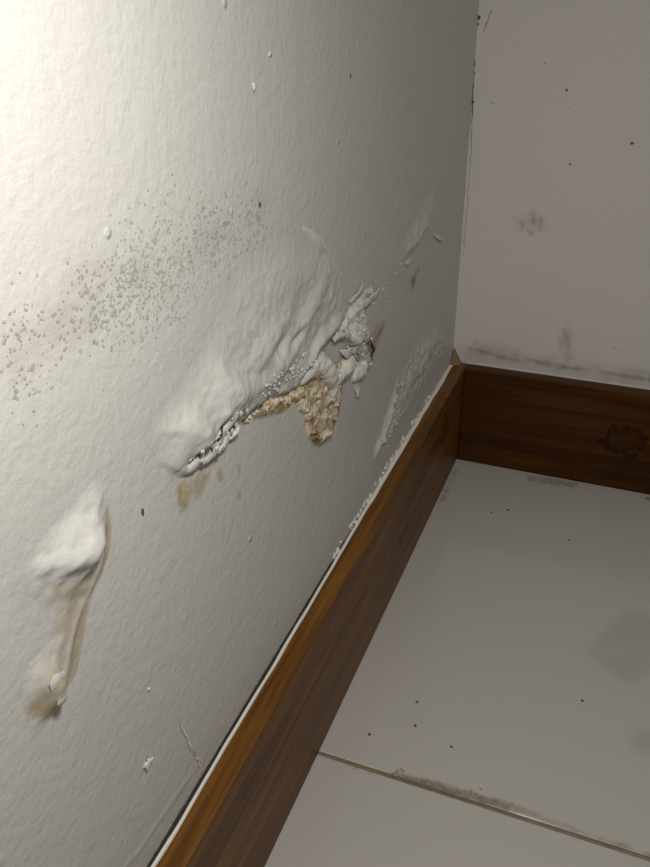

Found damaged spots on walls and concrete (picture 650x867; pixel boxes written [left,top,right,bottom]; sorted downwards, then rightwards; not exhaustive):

water stain [0,172,268,401]
flaking render [242,284,381,447]
water stain [96,512,111,583]
water stain [34,608,88,715]